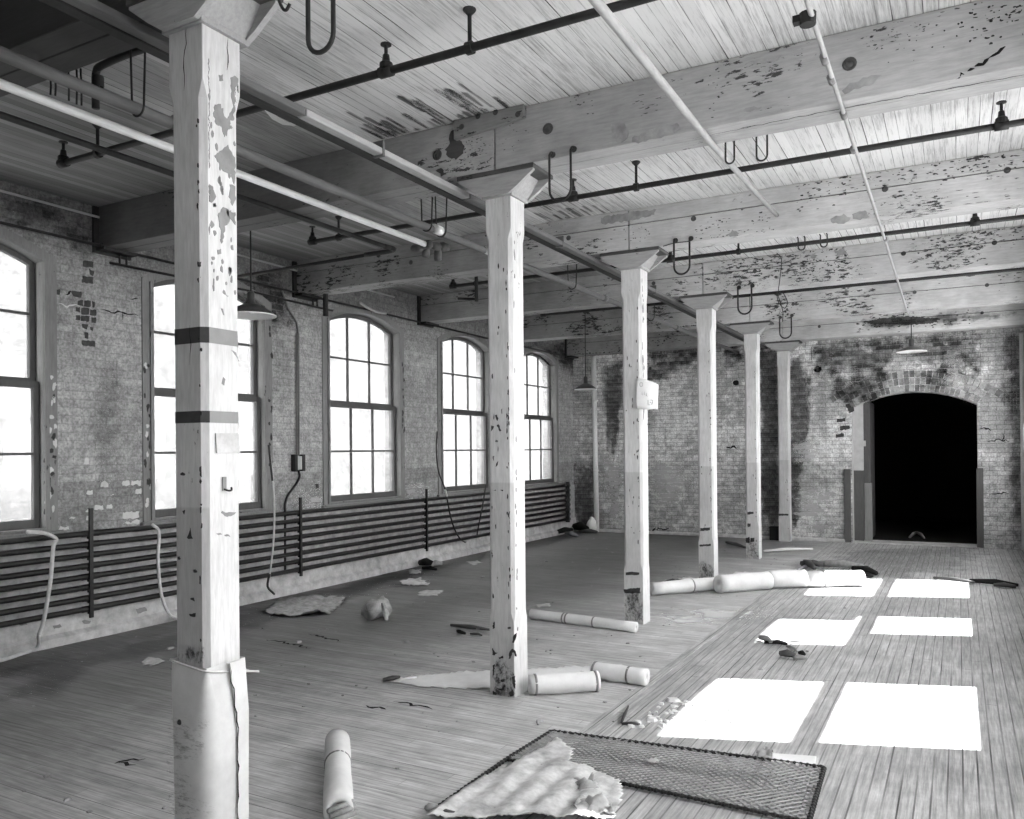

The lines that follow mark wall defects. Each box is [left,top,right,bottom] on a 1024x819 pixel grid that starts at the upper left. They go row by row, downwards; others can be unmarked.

leakage [347,83,508,139]
crack [693,46,1022,139]
peeling [196,59,238,315]
peeling [796,154,1024,224]
flaking render [57,260,96,347]
peeling [856,310,970,332]
peeling [43,375,151,530]
leakage [601,361,623,453]
leakage [813,332,979,403]
leakage [1002,336,1021,486]
peeling [624,588,643,620]
peeling [492,622,518,697]